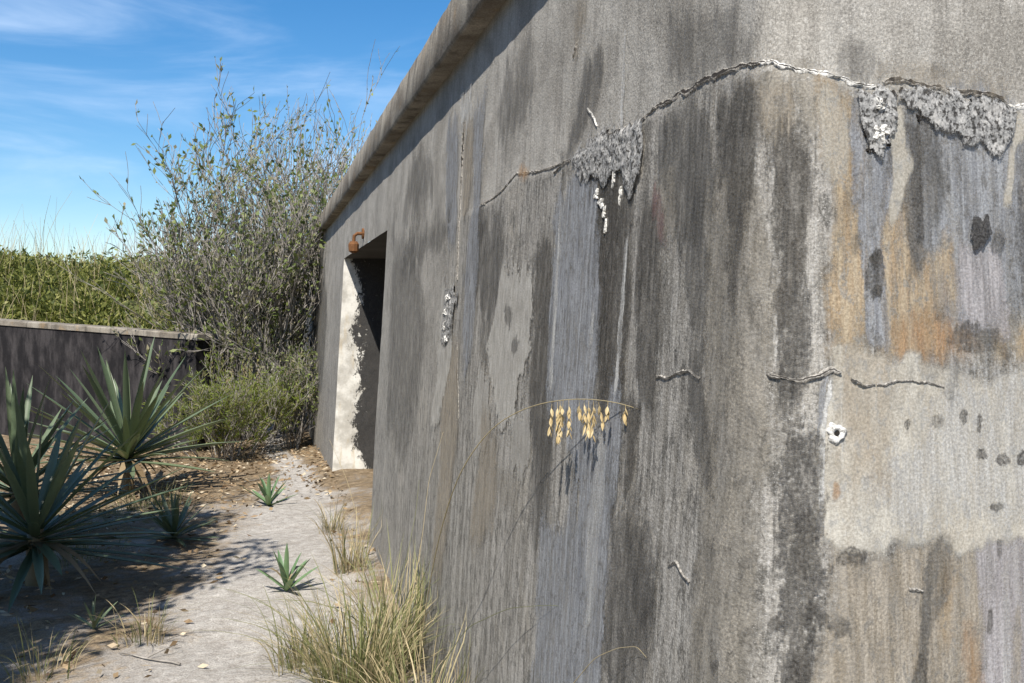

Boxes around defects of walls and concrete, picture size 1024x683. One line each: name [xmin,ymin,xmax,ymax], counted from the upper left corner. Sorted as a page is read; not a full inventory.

crack [456,122,574,280]
spalling [569,113,645,234]
crack [587,59,1024,137]
spalling [857,82,1017,161]
peeling [430,267,458,432]
leakage [526,169,660,683]
crack [655,369,701,380]
leakage [658,57,1024,683]
crack [766,366,945,388]